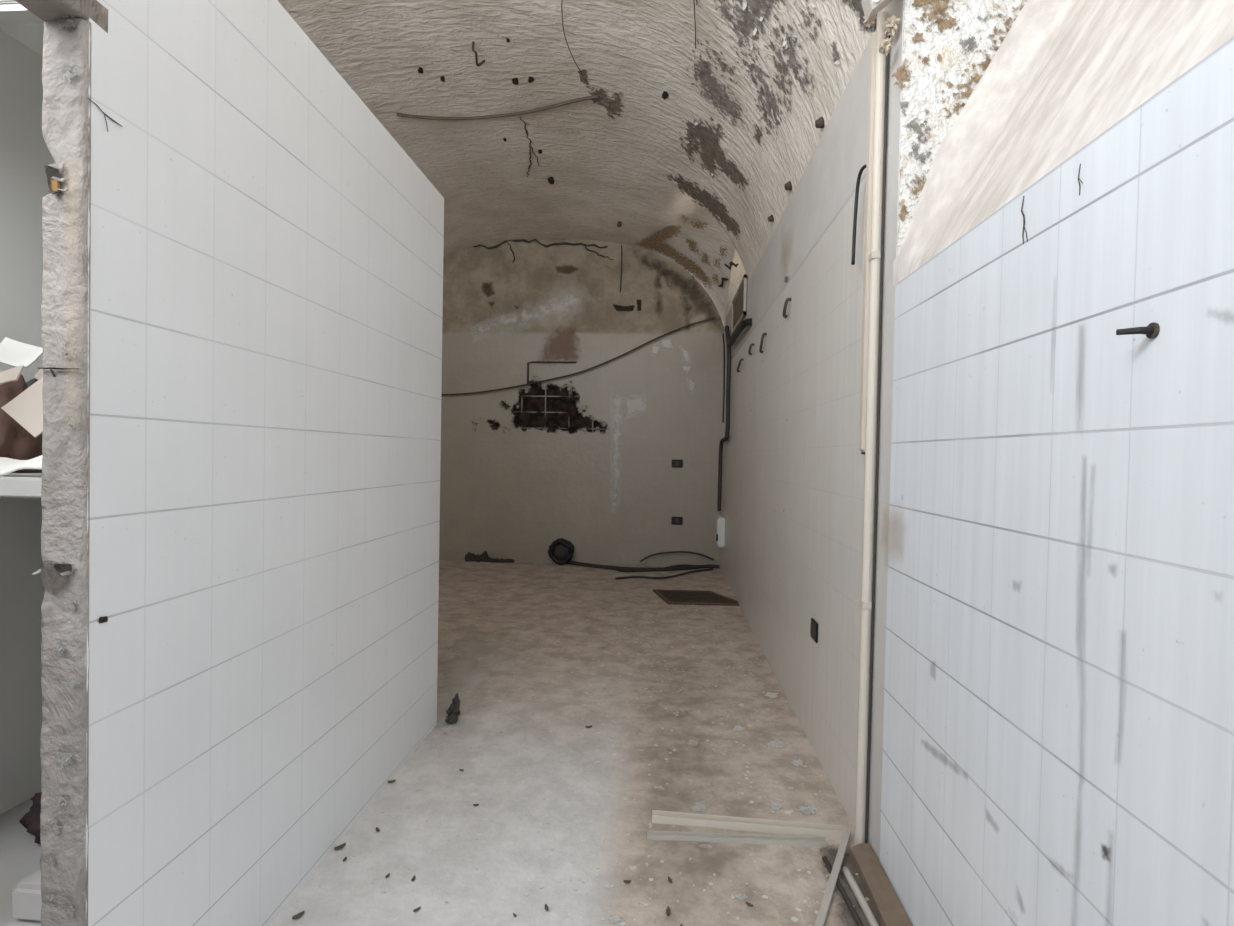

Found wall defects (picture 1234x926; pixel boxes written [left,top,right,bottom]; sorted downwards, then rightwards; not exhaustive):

spalling [838,0,877,32]
peeling [831,41,841,65]
peeling [663,0,823,240]
leakage [556,266,577,274]
leakage [636,215,727,328]
flaking render [473,376,608,434]